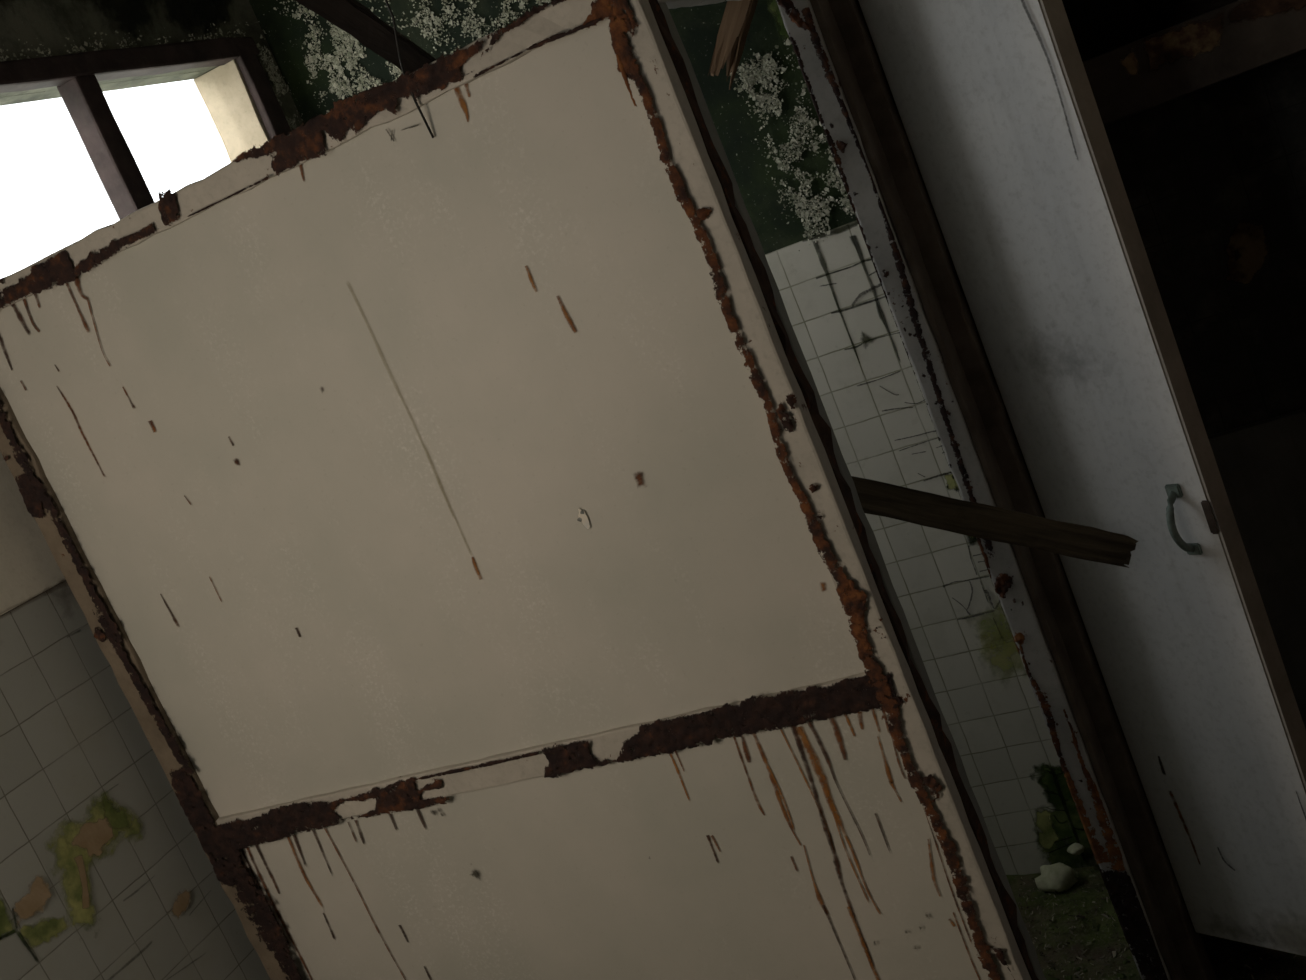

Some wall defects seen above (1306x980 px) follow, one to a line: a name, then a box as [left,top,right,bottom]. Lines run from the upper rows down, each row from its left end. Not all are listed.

peeling [274,0,402,114]
peeling [360,0,551,54]
crack [822,271,881,306]
crack [858,371,952,481]
corrosion [0,0,1015,980]
crack [943,546,1002,638]
corrosion [976,538,1126,871]